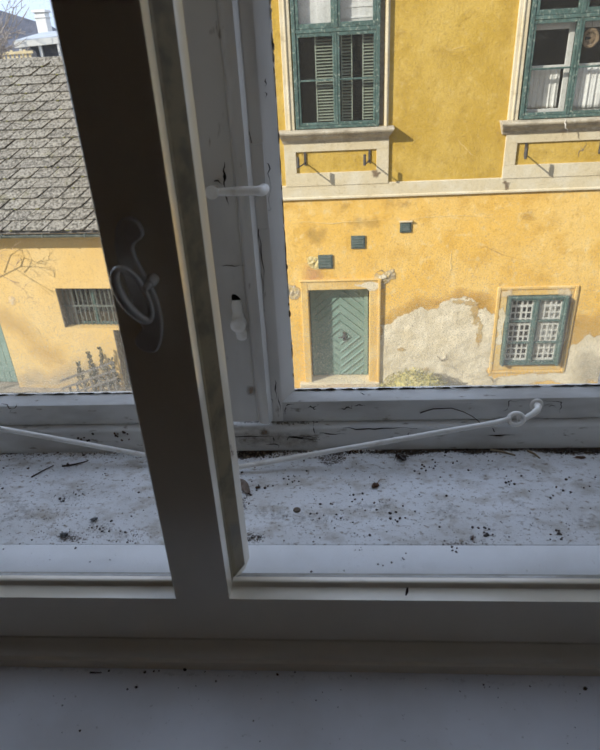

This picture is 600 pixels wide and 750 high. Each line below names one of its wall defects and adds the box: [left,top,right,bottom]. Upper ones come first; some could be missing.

crack [215,162,229,205]
flaking render [354,269,396,291]
flaking render [292,296,600,391]